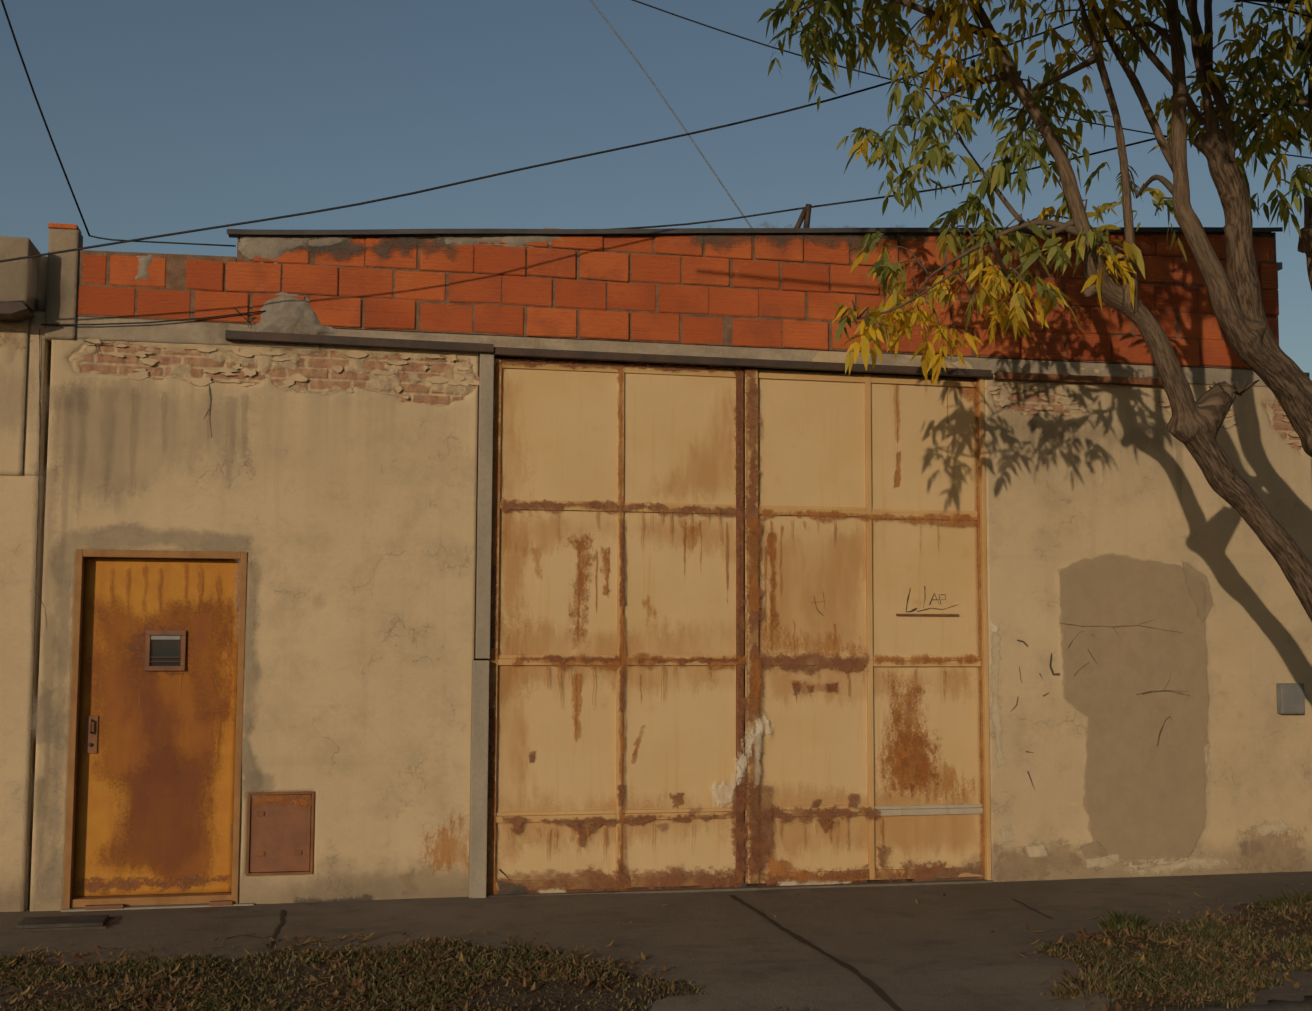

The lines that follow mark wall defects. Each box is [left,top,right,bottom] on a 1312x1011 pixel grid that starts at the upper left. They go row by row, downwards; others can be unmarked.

spalling [65,339,479,407]
spalling [984,384,1093,421]
spalling [1221,408,1241,429]
spalling [1261,402,1302,455]
rust [486,358,985,895]
rust [84,875,226,894]